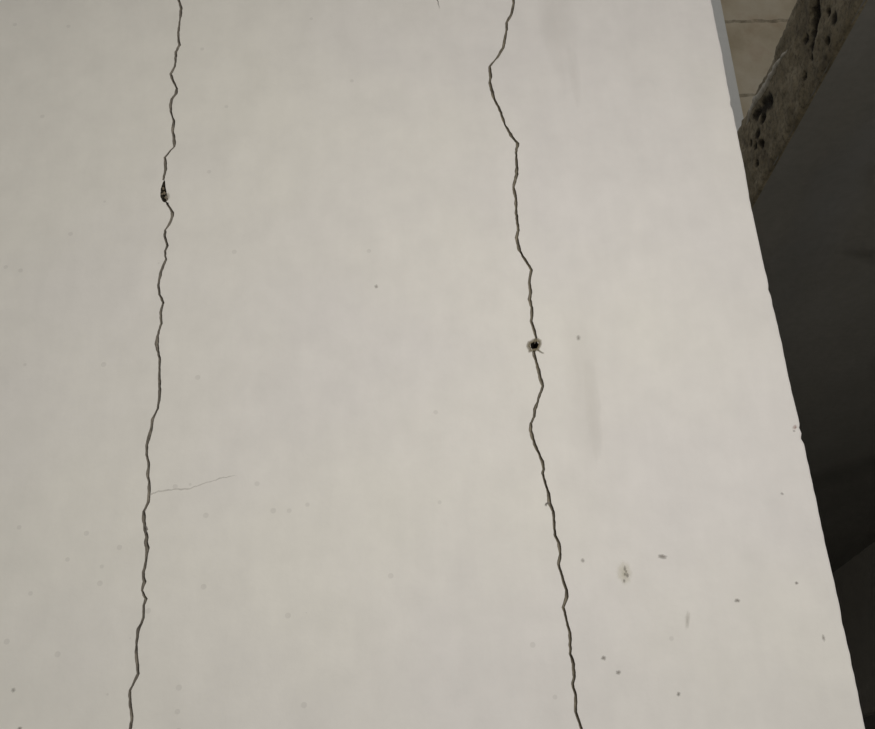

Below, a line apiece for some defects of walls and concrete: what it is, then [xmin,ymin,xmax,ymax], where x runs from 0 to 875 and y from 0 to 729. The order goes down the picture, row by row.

crack [162,0,183,180]
crack [128,204,174,729]
crack [488,0,583,729]